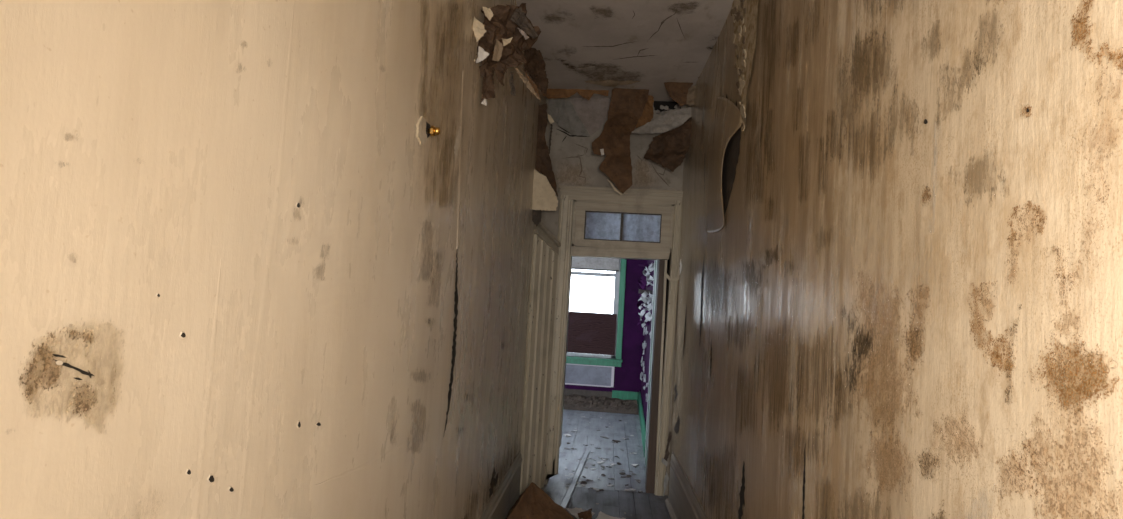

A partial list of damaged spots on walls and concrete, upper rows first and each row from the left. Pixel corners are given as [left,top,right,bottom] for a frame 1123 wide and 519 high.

peeling [473,6,513,64]
spalling [653,101,681,116]
leakage [20,331,93,404]
leakage [73,386,97,416]